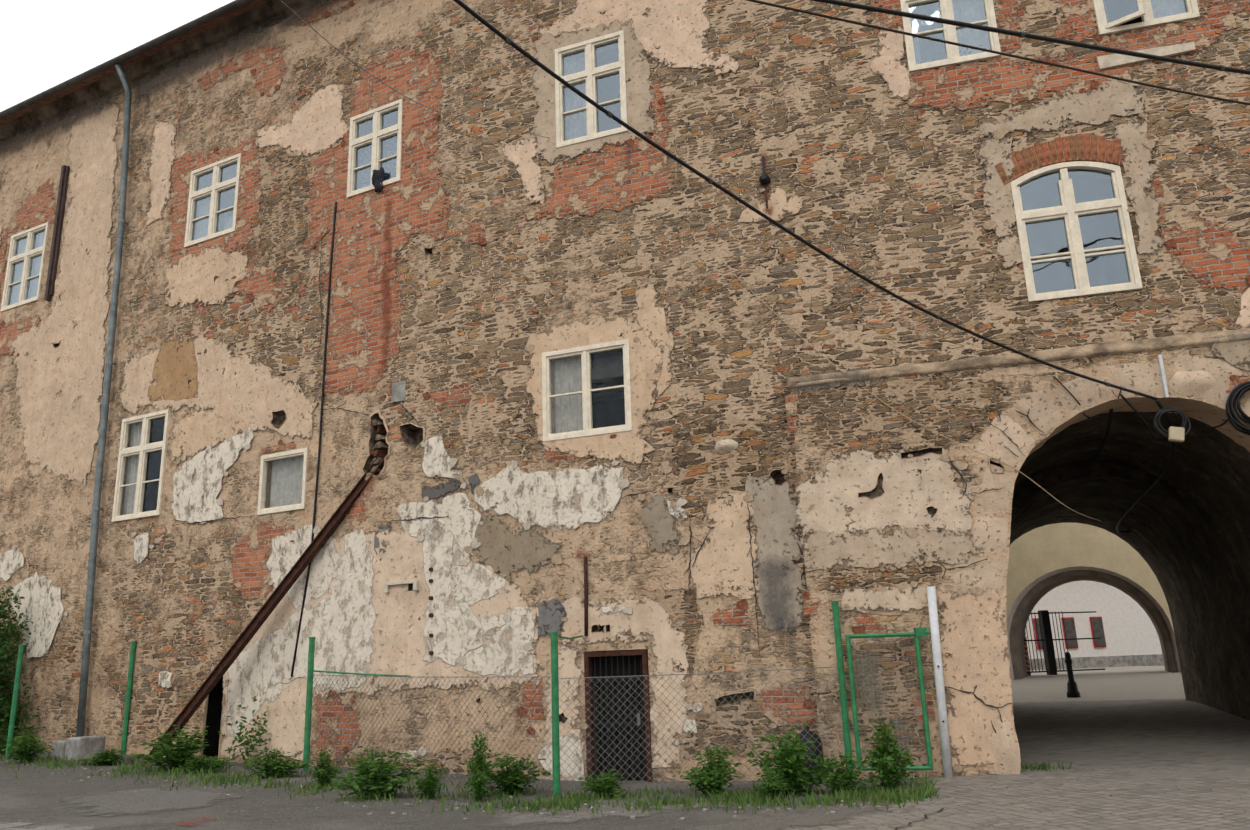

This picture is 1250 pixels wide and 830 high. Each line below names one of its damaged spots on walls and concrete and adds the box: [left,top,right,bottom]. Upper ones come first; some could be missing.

peeling [738,187,804,222]
spalling [870,0,1250,393]
peeling [0,102,119,486]
spalling [120,38,450,524]
peeling [0,546,68,659]
peeling [132,532,155,565]
peeling [220,277,1016,781]
peeling [158,671,172,688]
crack [947,685,1013,735]